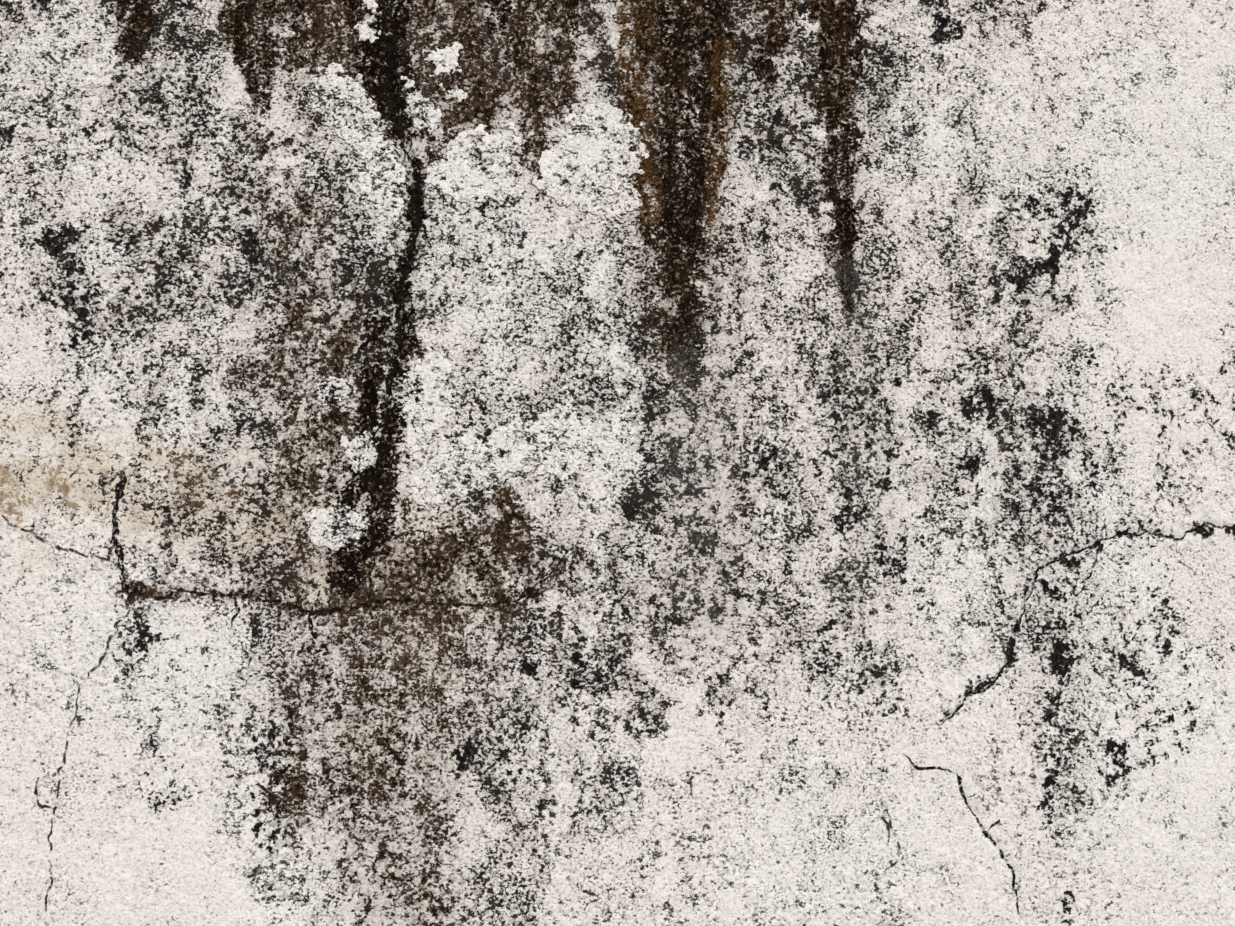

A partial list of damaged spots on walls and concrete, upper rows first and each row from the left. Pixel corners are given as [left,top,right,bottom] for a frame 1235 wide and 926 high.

leakage [0,109,33,189]
leakage [30,0,52,15]
leakage [15,204,113,362]
leakage [81,0,210,169]
leakage [171,163,196,189]
leakage [973,139,1117,308]
crack [1,0,584,924]
leakage [218,0,948,926]
crack [938,518,1235,729]
leakage [943,321,1235,831]
leakage [119,605,212,819]
crack [903,753,1023,920]